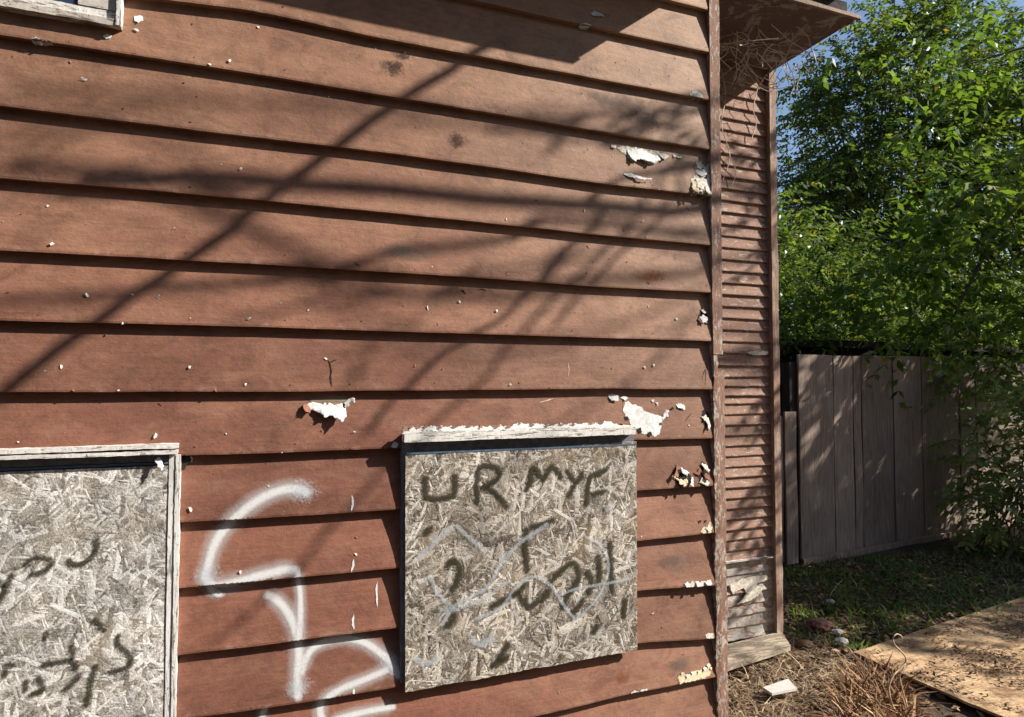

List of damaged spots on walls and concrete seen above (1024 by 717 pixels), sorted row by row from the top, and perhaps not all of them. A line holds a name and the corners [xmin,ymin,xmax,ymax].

peeling [611,145,682,186]
peeling [690,161,712,200]
peeling [303,395,355,422]
peeling [391,394,685,448]
peeling [673,461,710,487]
peeling [677,663,712,684]